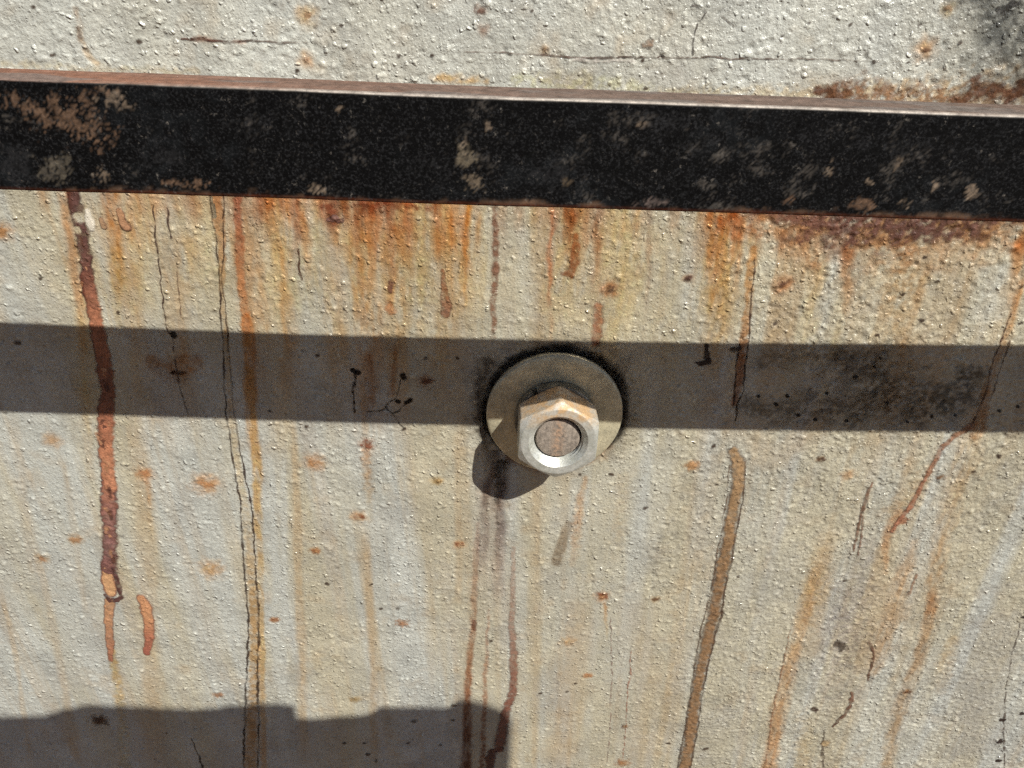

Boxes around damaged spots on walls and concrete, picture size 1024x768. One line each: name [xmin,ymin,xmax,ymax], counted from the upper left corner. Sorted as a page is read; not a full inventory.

rust [813,74,1024,104]
rust [67,192,124,662]
rust [210,196,249,376]
rust [491,214,499,331]
rust [563,233,580,278]
rust [730,259,756,421]
rust [751,214,998,248]
rust [890,313,1012,533]
rust [137,595,155,656]
rust [229,434,260,705]
rust [485,595,518,768]
rust [677,447,746,768]